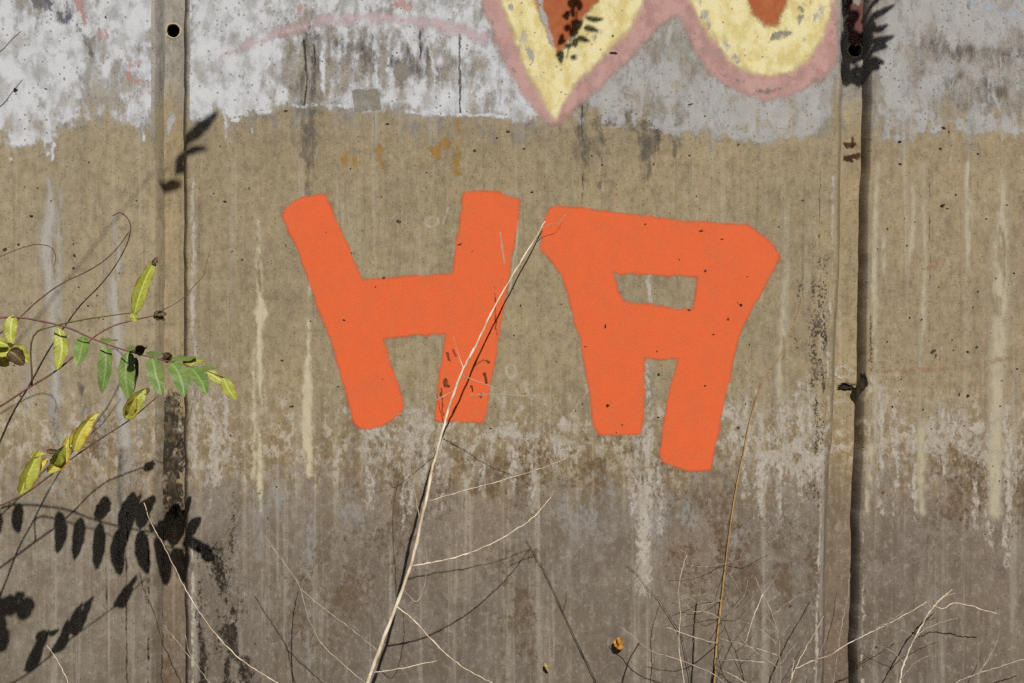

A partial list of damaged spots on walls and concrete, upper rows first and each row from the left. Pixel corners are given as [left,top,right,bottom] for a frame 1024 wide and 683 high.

damp [355,409,466,527]
damp [479,418,581,513]
damp [627,358,666,595]
damp [191,515,253,683]
damp [813,524,822,681]